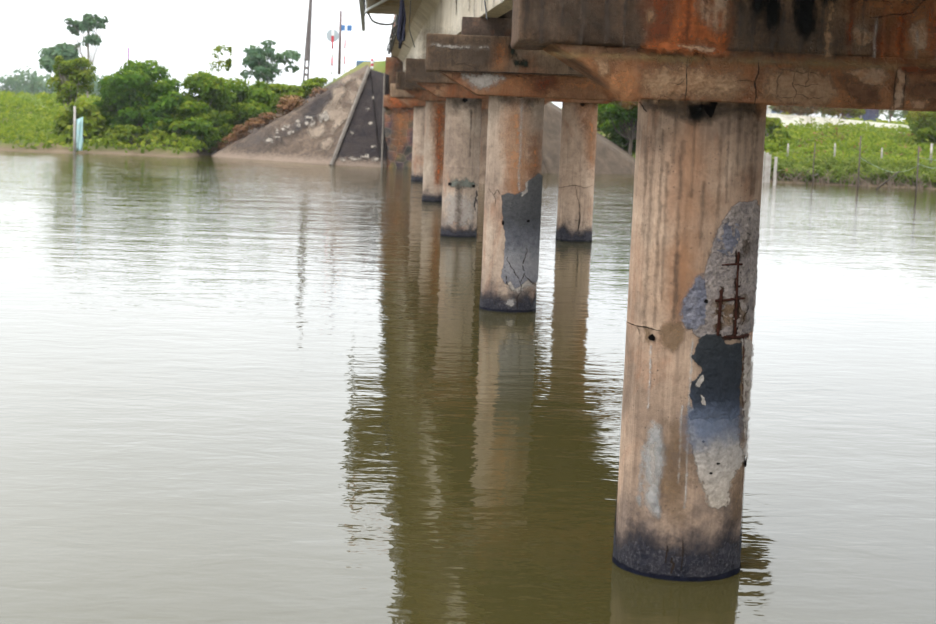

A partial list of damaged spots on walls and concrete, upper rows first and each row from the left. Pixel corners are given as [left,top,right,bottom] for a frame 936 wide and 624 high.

rust [648,0,731,55]
damp [734,0,838,66]
rust [461,55,639,100]
crack [735,61,822,104]
rust [432,101,446,182]
spalling [680,200,760,467]
damp [612,515,742,582]